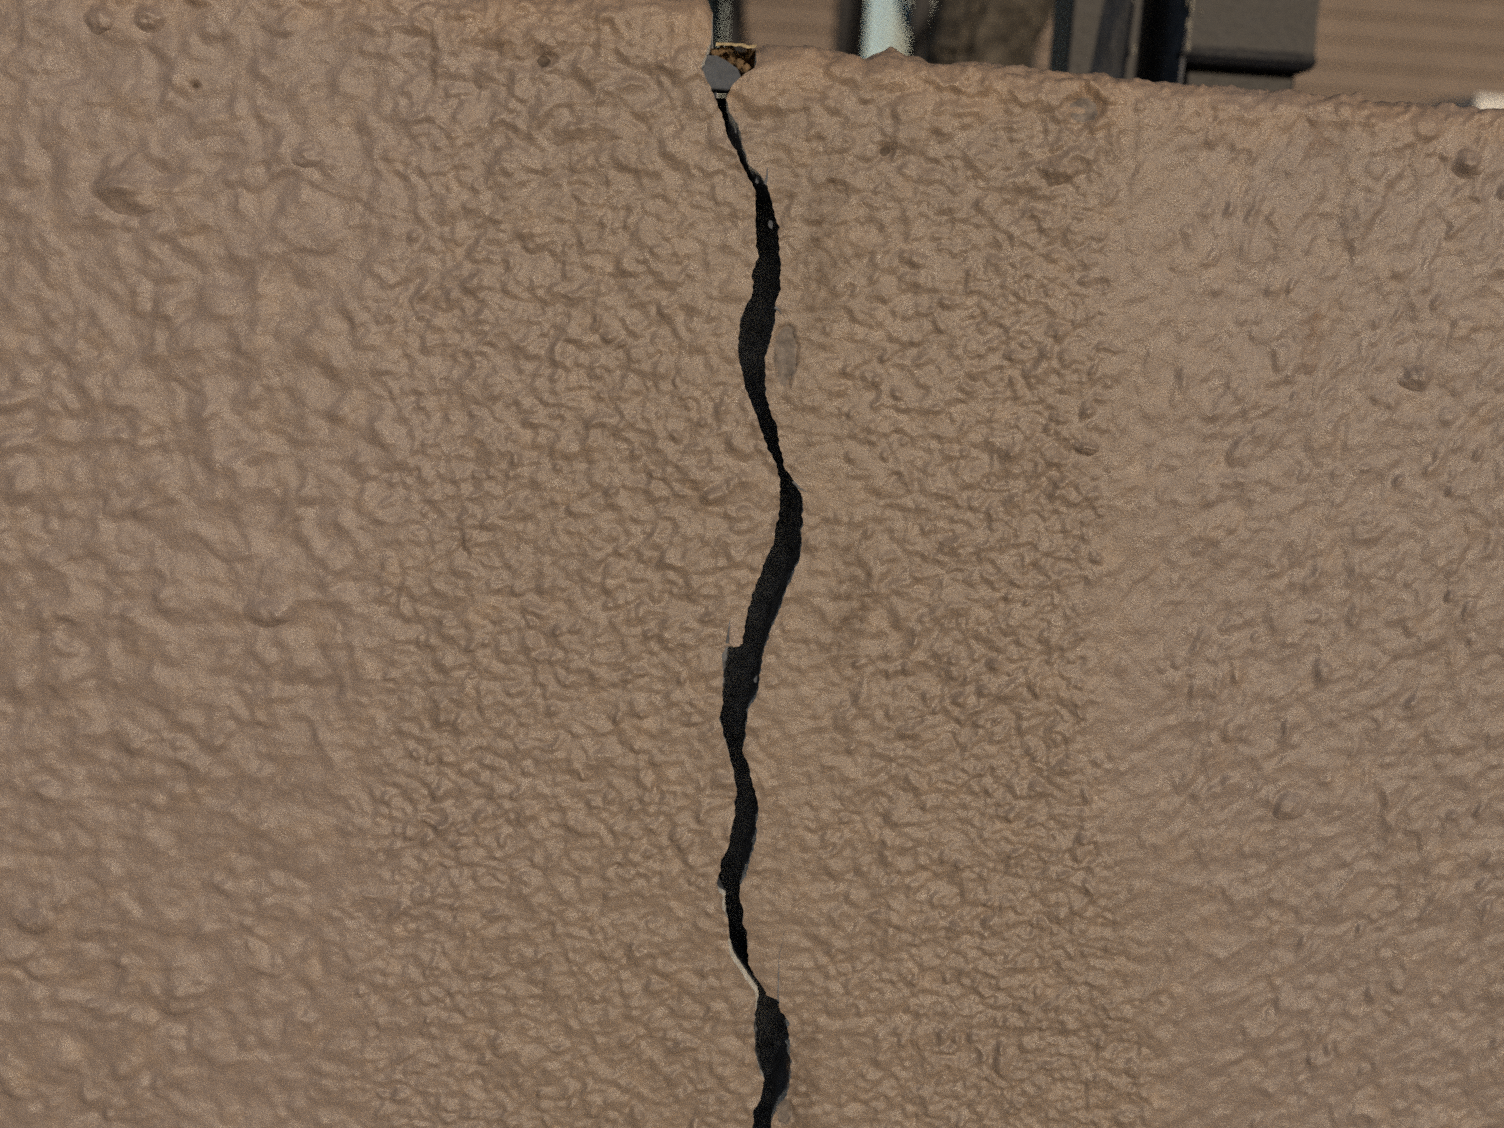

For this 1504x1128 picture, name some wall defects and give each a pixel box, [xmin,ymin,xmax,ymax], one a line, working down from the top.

crack [701,14,807,1128]